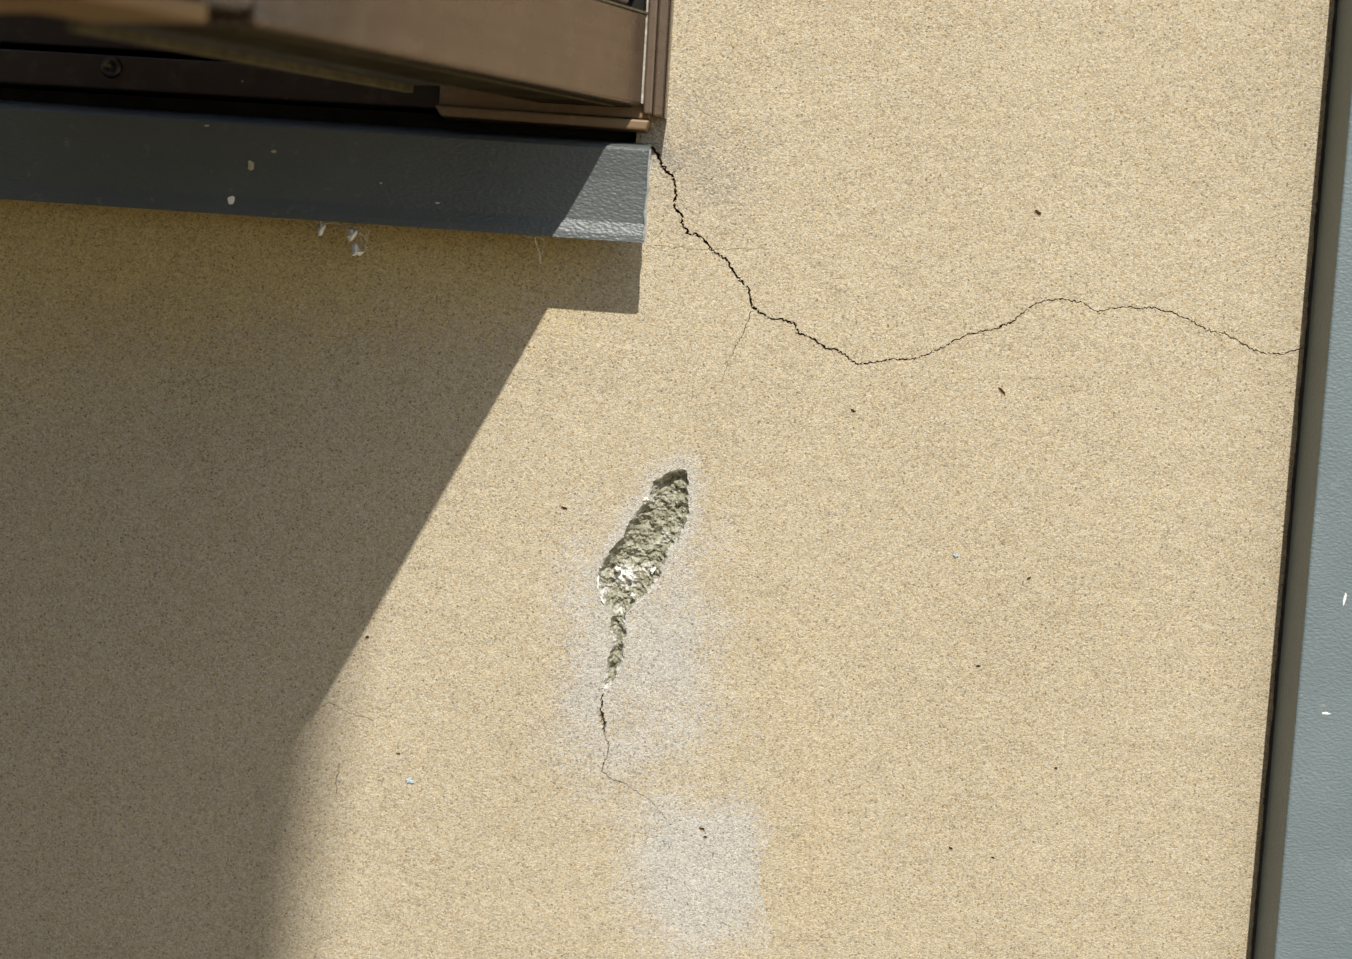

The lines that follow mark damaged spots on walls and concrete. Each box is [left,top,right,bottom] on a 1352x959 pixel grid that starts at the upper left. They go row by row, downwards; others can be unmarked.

crack [651,143,1302,382]
flaking render [595,458,699,699]
crack [599,694,666,818]